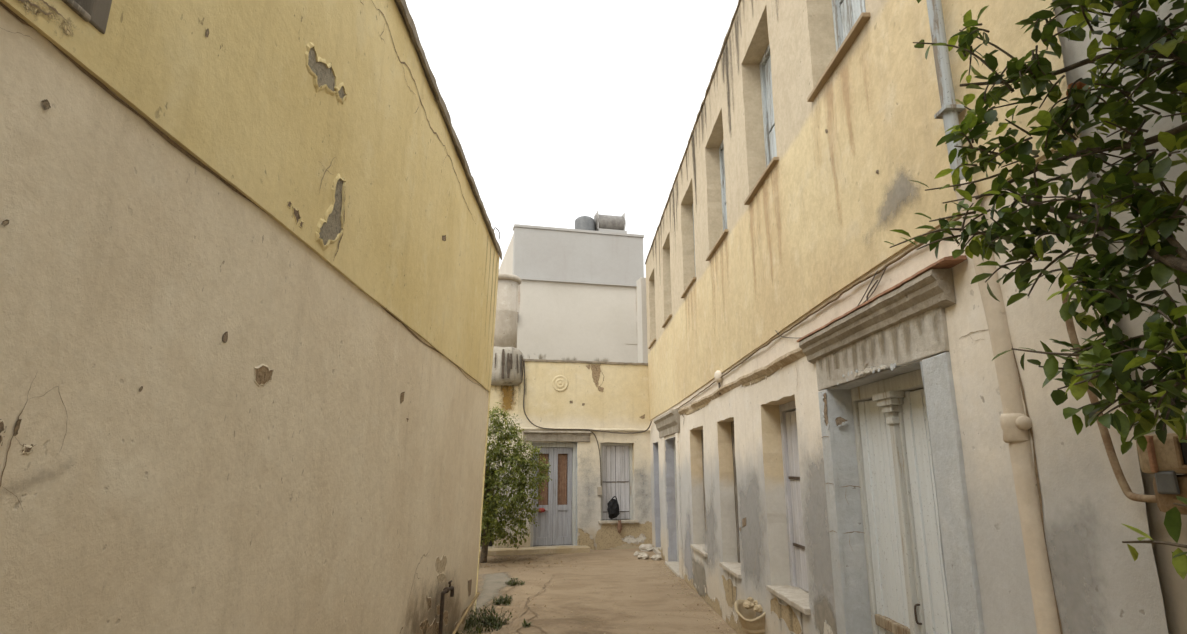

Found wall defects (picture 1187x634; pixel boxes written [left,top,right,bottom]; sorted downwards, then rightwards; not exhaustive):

crack [0,0,266,213]
spalling [305,42,348,105]
crack [360,0,476,224]
spalling [287,173,346,251]
spalling [254,364,274,387]
crack [362,291,489,392]
spalling [0,419,33,455]
crack [0,371,67,512]
leakage [413,593,458,634]